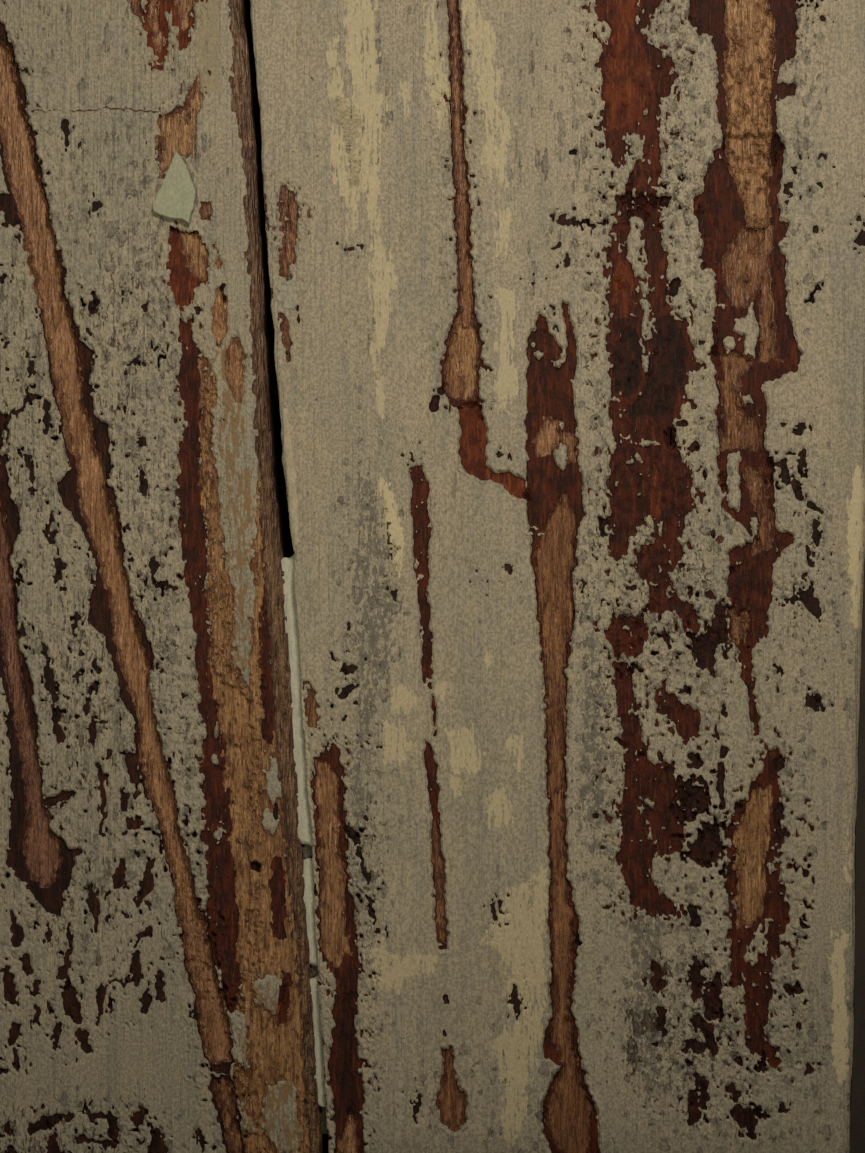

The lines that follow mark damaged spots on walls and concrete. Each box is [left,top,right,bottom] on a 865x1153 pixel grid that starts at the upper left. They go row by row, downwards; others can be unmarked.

peeling [0,0,388,1153]
spalling [382,441,449,950]
peeling [429,0,838,1153]